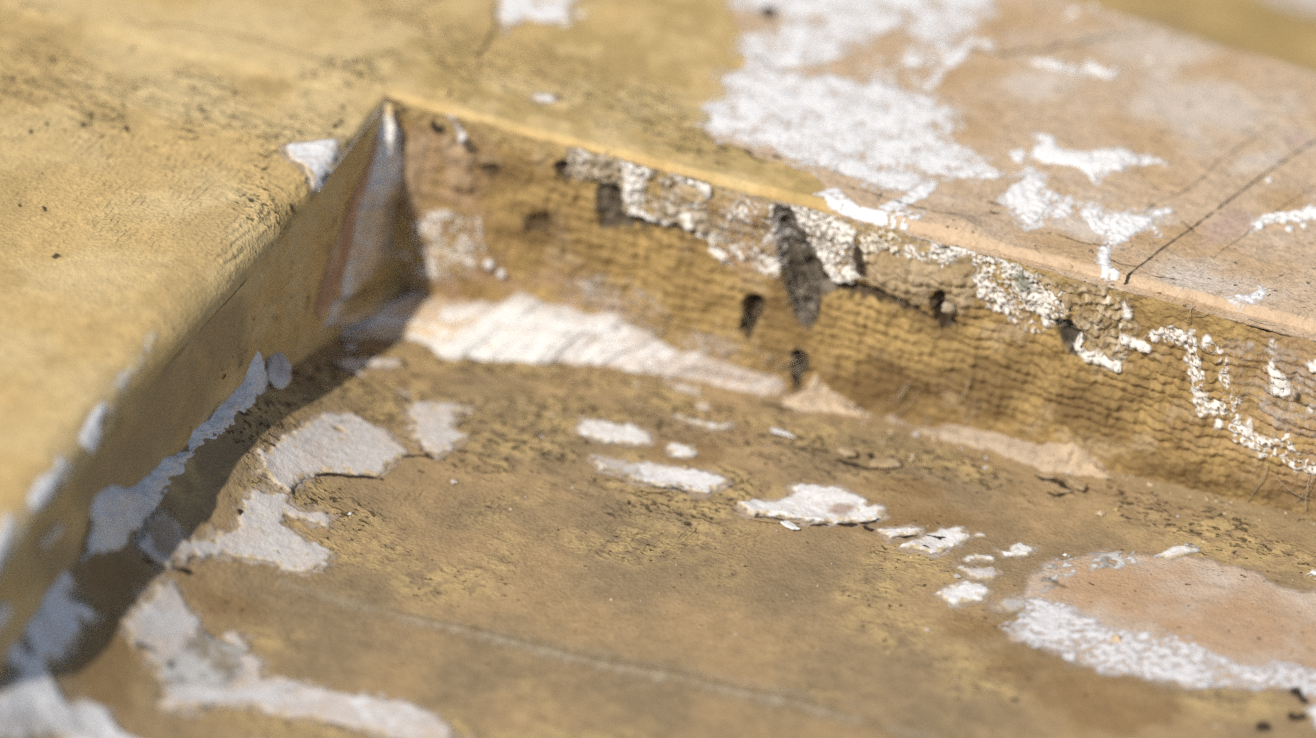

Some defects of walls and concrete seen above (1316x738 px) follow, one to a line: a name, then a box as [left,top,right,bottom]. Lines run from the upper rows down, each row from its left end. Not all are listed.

peeling [492,0,588,35]
peeling [528,92,562,104]
spalling [256,97,1114,499]
peeling [705,0,1316,362]
crack [1055,123,1316,284]
peeling [0,327,475,738]
peeling [734,482,1316,726]
peeling [1255,722,1271,730]